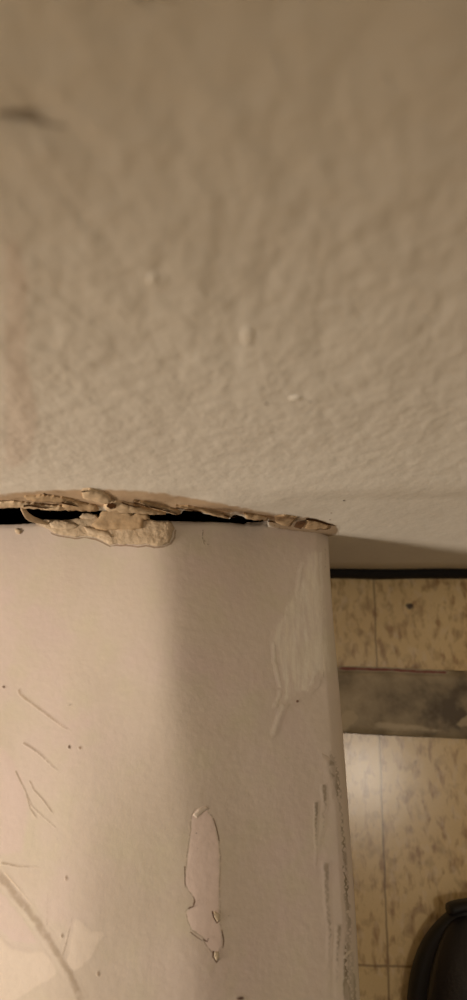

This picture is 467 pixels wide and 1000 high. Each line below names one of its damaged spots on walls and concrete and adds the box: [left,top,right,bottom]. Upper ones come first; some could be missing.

crack [0,507,103,525]
flaking render [0,487,340,549]
crack [133,510,275,549]
peeling [184,805,224,963]